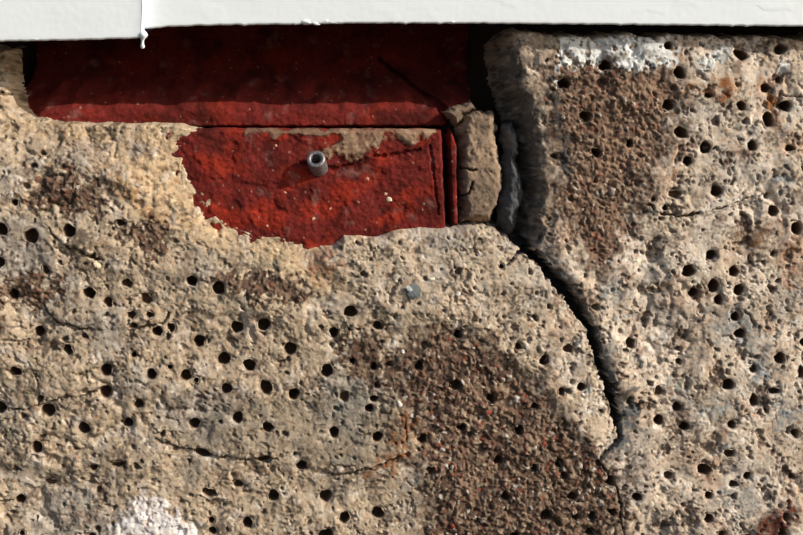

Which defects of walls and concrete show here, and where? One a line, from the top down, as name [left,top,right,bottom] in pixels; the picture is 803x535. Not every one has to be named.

spalling [25,19,476,250]
crack [647,195,760,217]
crack [496,222,625,534]